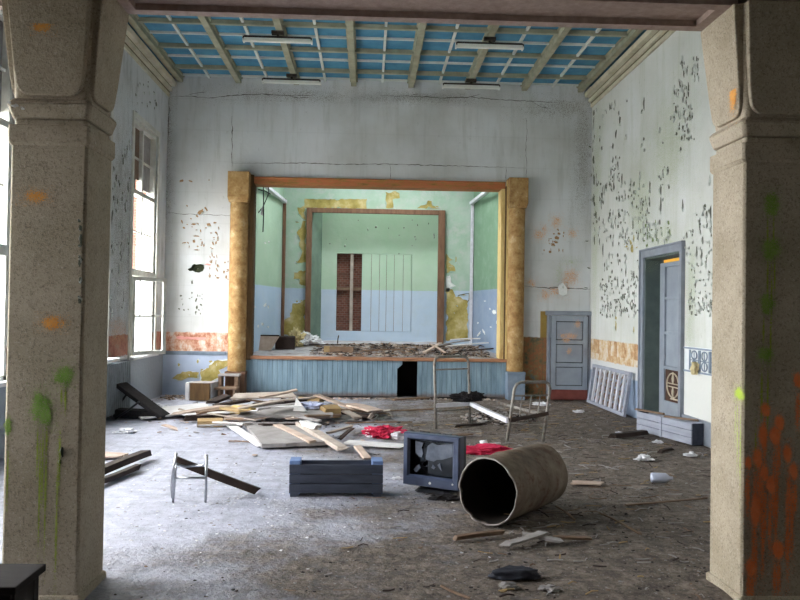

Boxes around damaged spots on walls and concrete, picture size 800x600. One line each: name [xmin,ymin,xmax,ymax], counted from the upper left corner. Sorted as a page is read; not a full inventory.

crack [406,94,556,173]
peeling [670,55,699,152]
peeling [178,207,229,315]
peeling [294,199,367,286]
peeling [385,191,400,209]
peeling [586,101,672,334]
peeling [683,204,712,317]
peeling [284,300,305,336]
peeling [172,359,227,381]